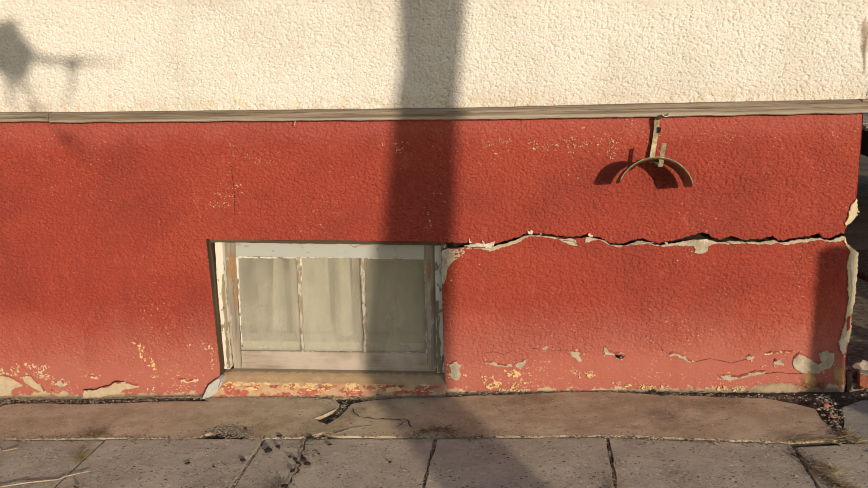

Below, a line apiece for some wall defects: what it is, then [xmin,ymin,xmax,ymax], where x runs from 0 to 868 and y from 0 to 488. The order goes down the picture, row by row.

spalling [844,199,860,226]
crack [463,230,845,251]
spalling [717,238,859,392]
peeling [0,363,70,396]
peeling [83,342,158,399]
peeling [219,381,444,398]
peeling [445,361,467,381]
peeling [481,359,531,392]
peeling [570,349,596,379]
peeling [604,346,629,364]
crack [314,408,412,427]
crack [282,437,308,488]